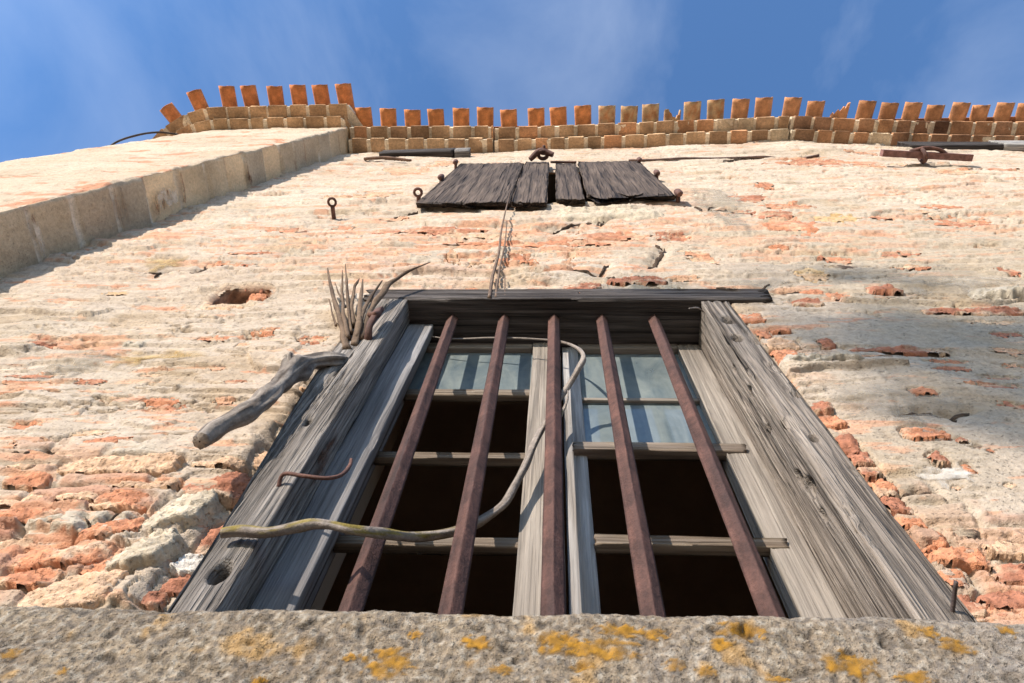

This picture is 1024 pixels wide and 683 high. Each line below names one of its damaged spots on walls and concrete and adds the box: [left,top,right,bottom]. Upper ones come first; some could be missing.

flaking render [202,283,272,311]
spalling [2,420,43,449]
spalling [0,430,267,612]
spalling [811,401,1024,622]